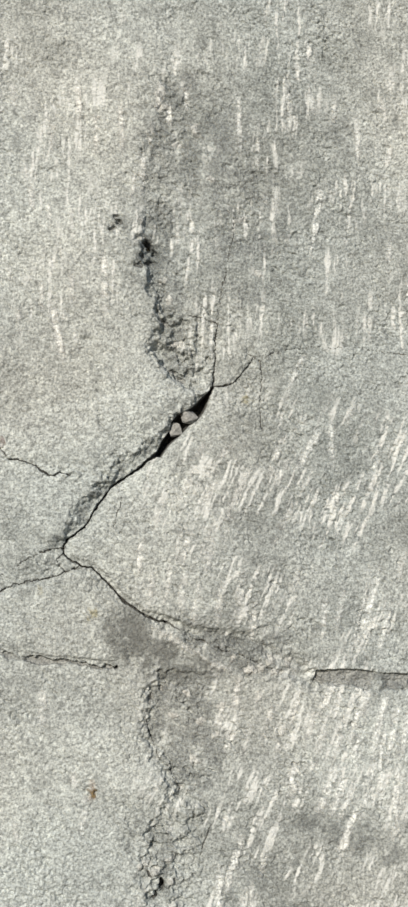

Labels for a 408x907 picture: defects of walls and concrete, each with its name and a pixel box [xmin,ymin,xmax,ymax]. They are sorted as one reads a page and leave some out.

water stain [155,84,189,124]
water stain [132,157,145,191]
crack [0,224,377,669]